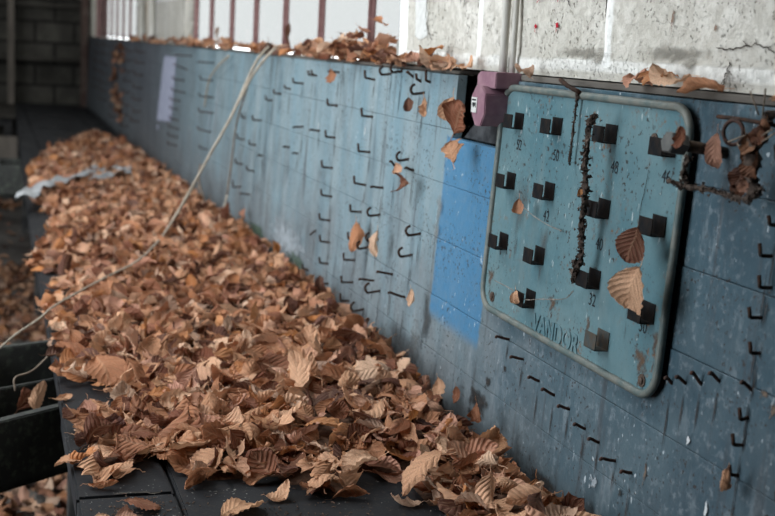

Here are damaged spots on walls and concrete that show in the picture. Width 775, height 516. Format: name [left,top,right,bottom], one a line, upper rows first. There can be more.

crack [716,39,775,85]